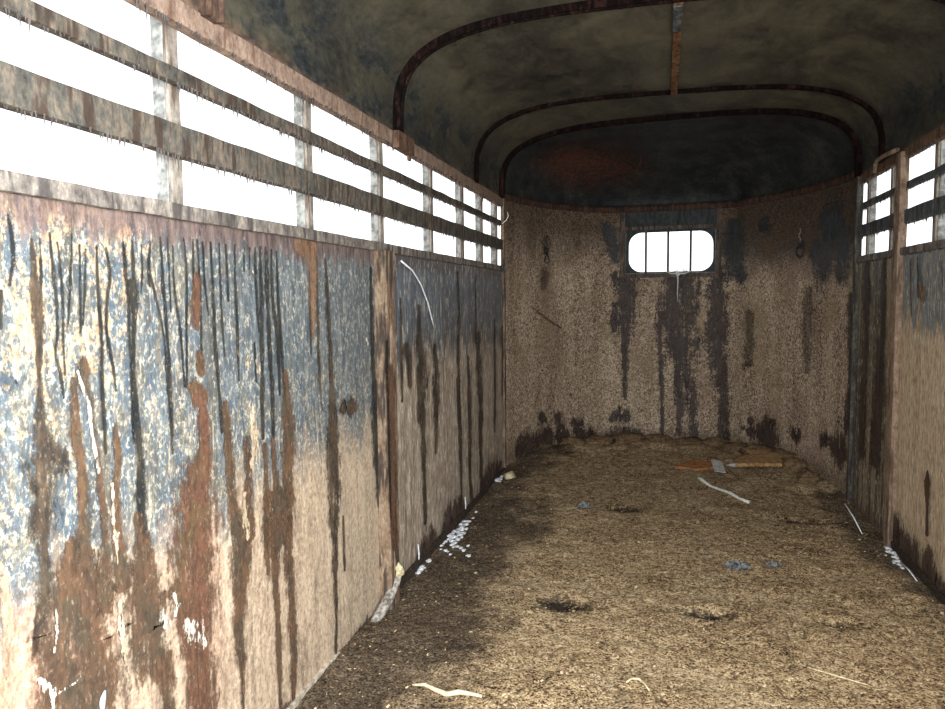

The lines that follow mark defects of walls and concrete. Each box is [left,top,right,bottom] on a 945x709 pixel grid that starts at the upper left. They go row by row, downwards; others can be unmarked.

corrosion [190,272,203,331]
corrosion [294,238,317,339]
leakage [515,264,801,460]
peeling [76,370,100,474]
peeling [248,403,259,479]
corrosion [387,363,399,551]
peeling [110,483,120,564]
corrosion [28,350,298,709]
peeling [242,491,250,540]
peeling [0,575,78,709]
peeling [117,599,129,681]
peeling [159,592,207,650]